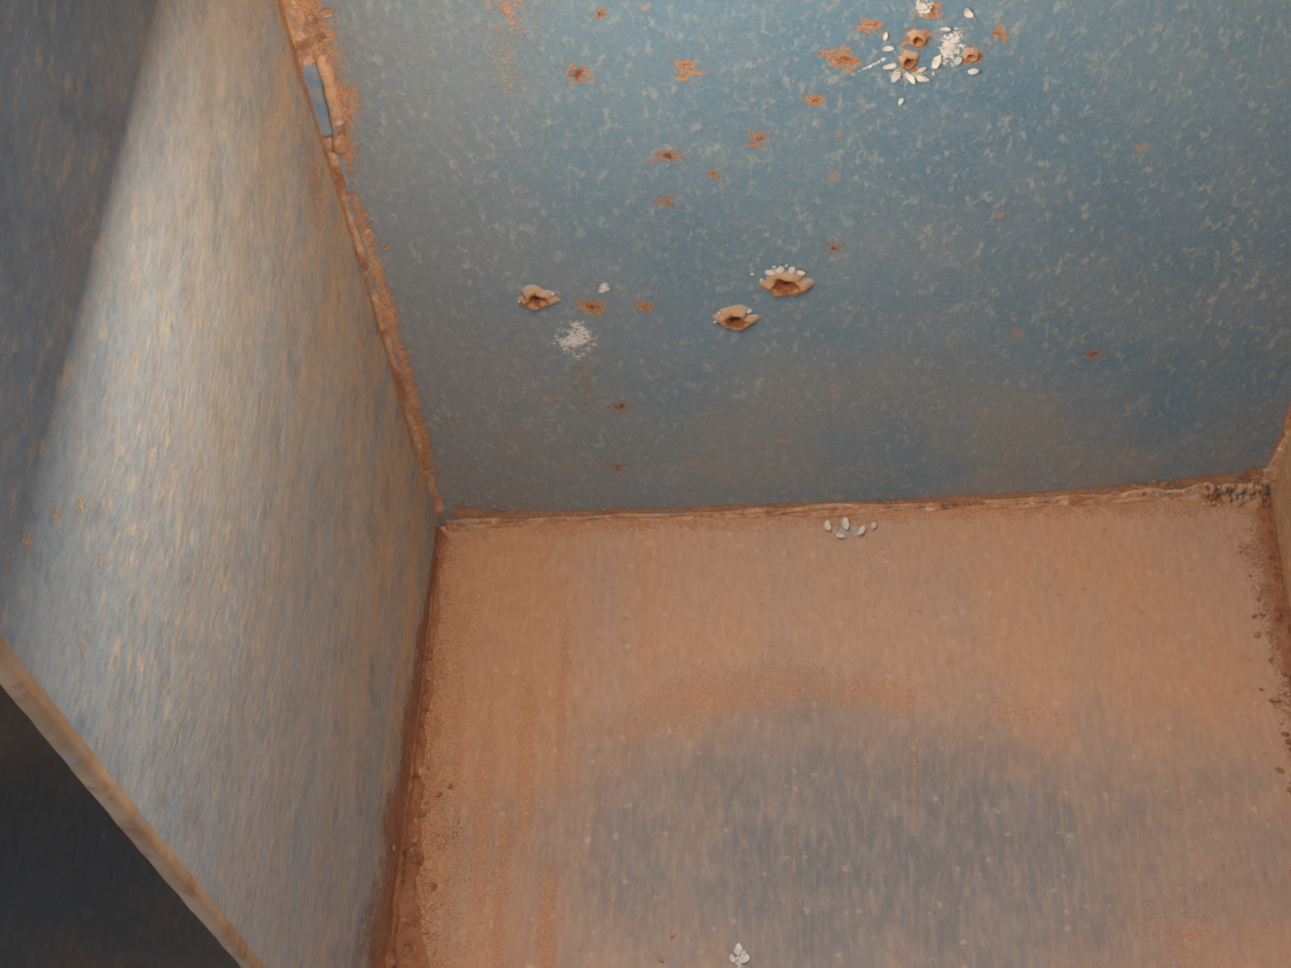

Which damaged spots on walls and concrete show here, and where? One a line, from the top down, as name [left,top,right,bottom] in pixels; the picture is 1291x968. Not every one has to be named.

peeling [297,38,355,219]